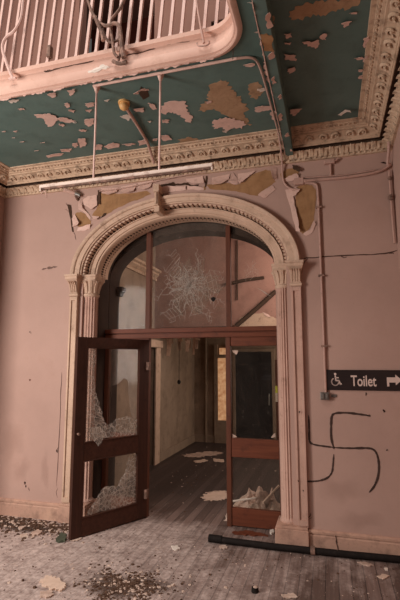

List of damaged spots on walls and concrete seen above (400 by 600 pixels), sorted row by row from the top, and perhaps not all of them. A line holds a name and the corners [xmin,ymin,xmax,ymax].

peeling [289,0,360,28]
peeling [302,33,327,49]
peeling [199,0,301,153]
peeling [35,89,95,158]
peeling [96,135,198,150]
peeling [120,87,193,123]
peeling [67,180,154,232]
peeling [161,165,316,236]